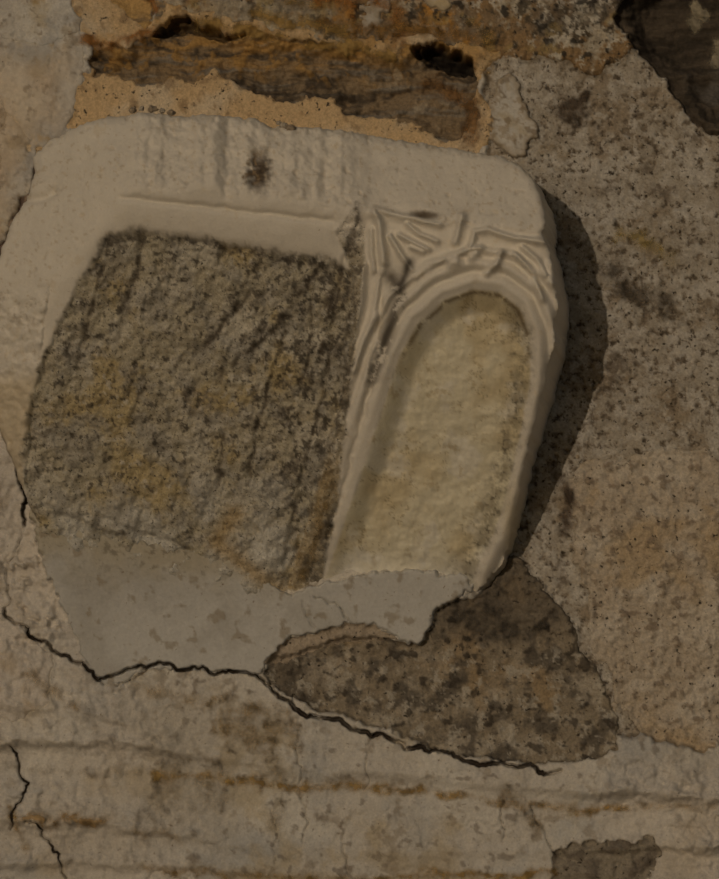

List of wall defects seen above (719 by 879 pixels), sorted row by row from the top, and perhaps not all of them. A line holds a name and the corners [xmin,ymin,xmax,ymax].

rust [82,34,114,49]
peeling [66,0,719,764]
crack [18,480,28,526]
crack [3,609,550,776]
crack [10,746,62,868]
spalling [551,835,662,879]